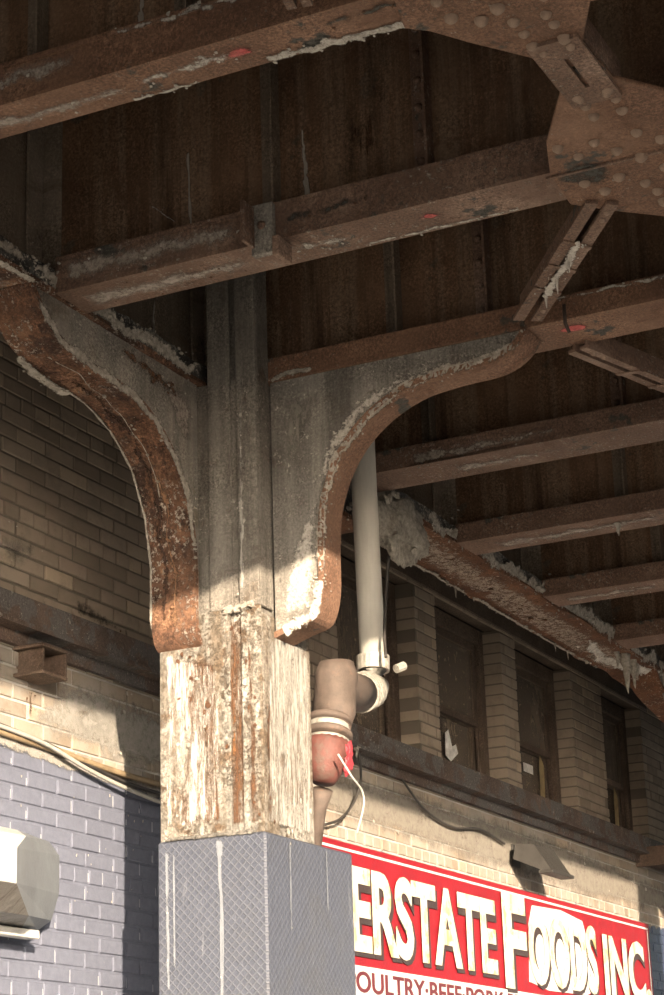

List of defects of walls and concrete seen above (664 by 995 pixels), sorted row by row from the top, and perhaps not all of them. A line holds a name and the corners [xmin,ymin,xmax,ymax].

leakage [0,237,199,632]
efflorescence [415,516,664,676]
rust [176,622,276,825]